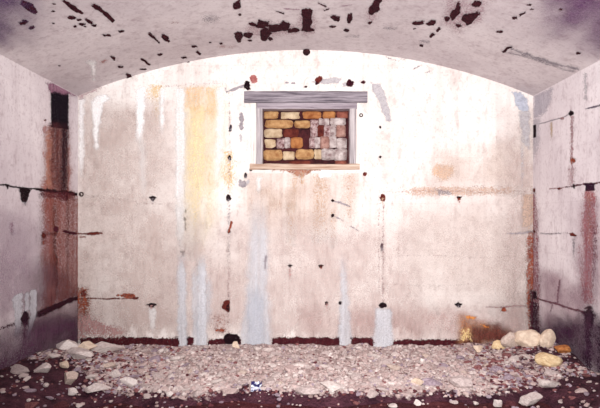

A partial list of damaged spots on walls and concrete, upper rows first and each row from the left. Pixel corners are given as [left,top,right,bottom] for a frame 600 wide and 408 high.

spalling [20,0,38,15]
spalling [51,0,97,28]
spalling [91,2,115,23]
spalling [234,8,317,43]
spalling [412,0,492,38]
damp [176,87,237,236]
crack [0,184,103,201]
corrosion [36,125,129,341]
damp [0,170,480,370]
corrosion [520,188,553,332]
corrosion [577,183,600,307]